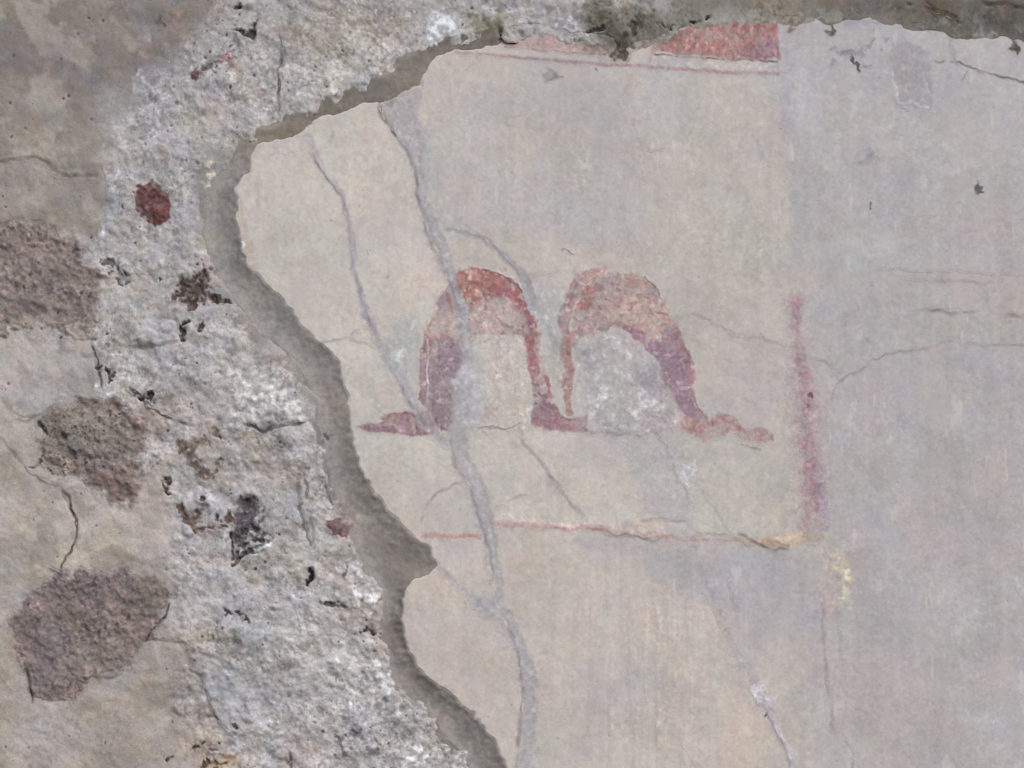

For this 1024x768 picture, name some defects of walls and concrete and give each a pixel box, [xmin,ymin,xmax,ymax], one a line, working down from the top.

hole [230,22,257,39]
hole [98,260,131,288]
hole [157,262,234,334]
crack [246,34,800,768]
spalling [162,484,274,568]
hole [215,607,251,625]